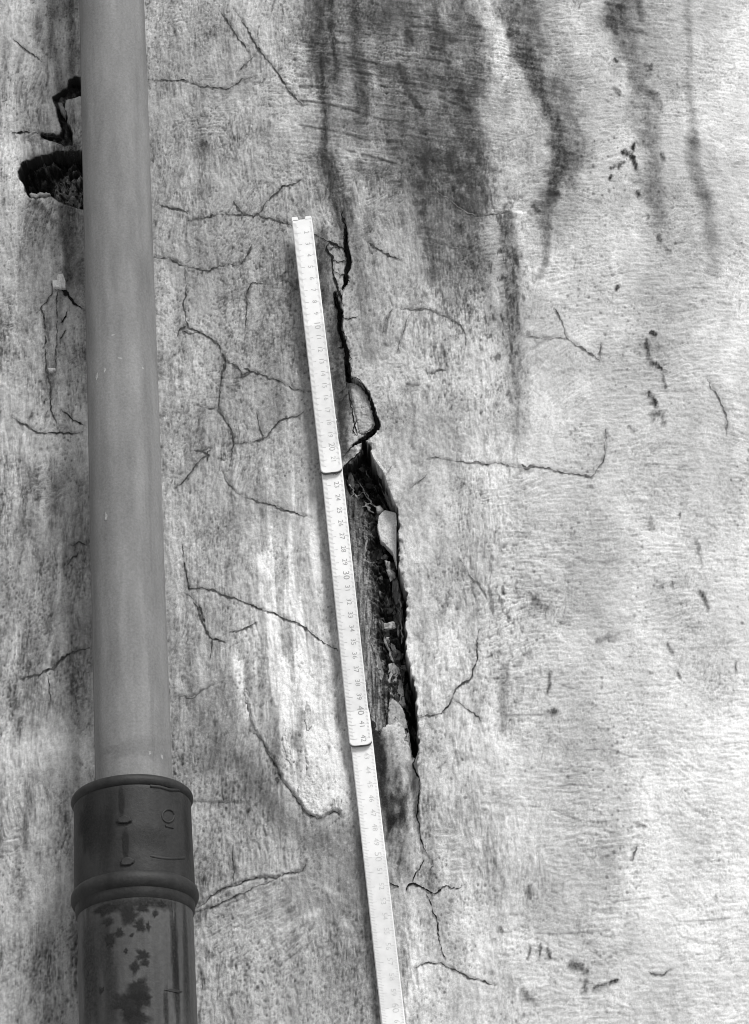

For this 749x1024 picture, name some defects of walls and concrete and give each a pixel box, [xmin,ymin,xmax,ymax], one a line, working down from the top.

flaking render [46,87,81,146]
damp [308,0,357,229]
damp [500,0,579,212]
crack [12,283,82,434]
crack [154,244,307,516]
crack [160,179,399,466]
damp [316,230,334,302]
damp [331,310,351,460]
damp [500,210,522,340]
crack [182,545,338,658]
flaking render [343,385,417,758]
crack [389,758,491,985]